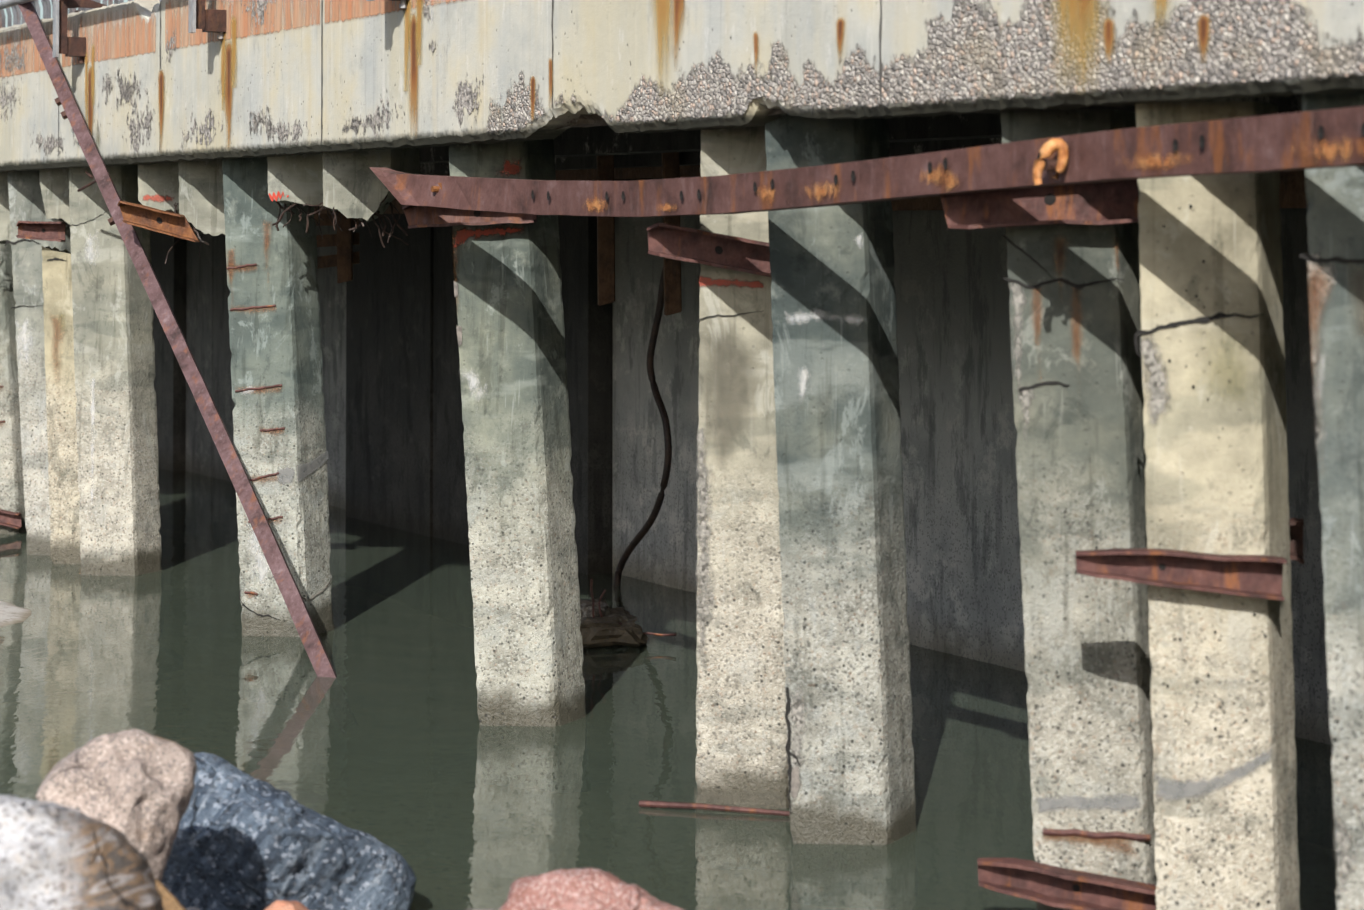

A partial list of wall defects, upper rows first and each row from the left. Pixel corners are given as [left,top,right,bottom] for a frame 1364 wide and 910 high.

rust [85,47,94,135]
rust [221,19,236,147]
rust [404,0,422,123]
rust [531,59,552,120]
rust [655,0,684,64]
spalling [451,0,1364,132]
rust [1315,139,1364,162]
spalling [272,195,409,248]
crack [1003,235,1124,289]
crack [1299,253,1364,264]
crack [1134,312,1263,357]
crack [785,687,801,814]